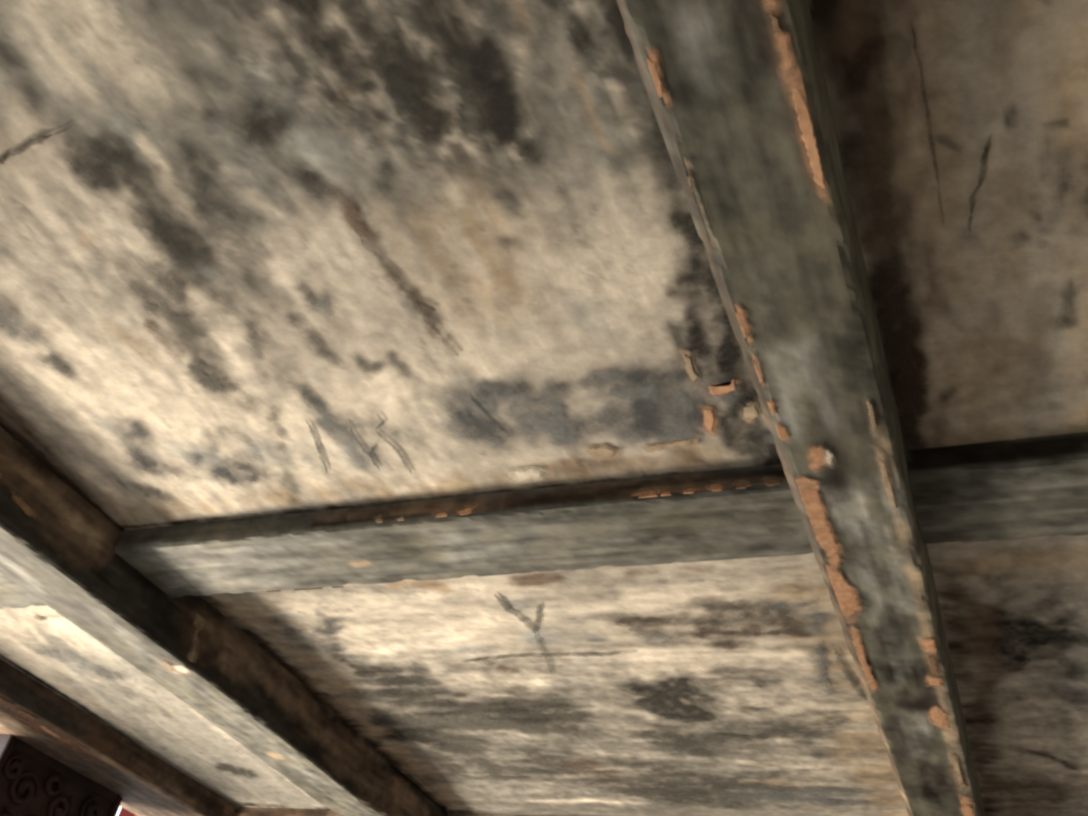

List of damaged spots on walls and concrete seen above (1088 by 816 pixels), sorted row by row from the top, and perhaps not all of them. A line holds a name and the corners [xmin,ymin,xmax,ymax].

water stain [599,0,633,53]
crack [0,128,68,164]
peeling [765,0,826,197]
crack [970,142,990,220]
water stain [65,138,209,342]
water stain [588,212,781,466]
peeling [642,349,736,452]
peeling [632,447,877,690]
water stain [323,618,792,808]
water stain [615,602,825,649]
peeling [920,639,942,687]
peeling [949,754,974,816]